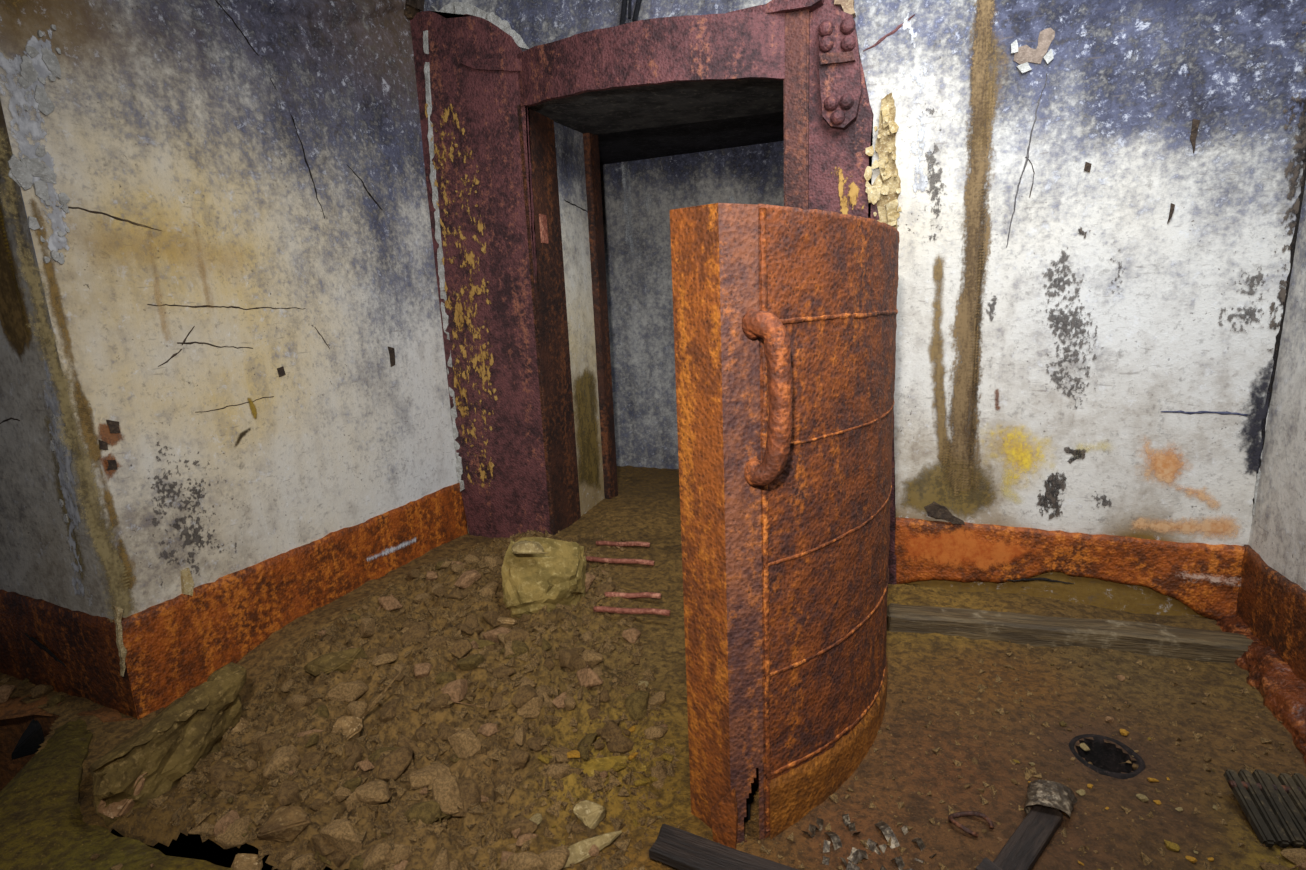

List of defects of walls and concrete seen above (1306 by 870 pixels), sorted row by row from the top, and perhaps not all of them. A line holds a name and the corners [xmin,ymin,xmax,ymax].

peeling [903,15,917,48]
peeling [0,24,70,264]
peeling [831,66,931,228]
water stain [924,143,946,240]
water stain [0,129,136,618]
water stain [986,295,997,321]
water stain [1040,247,1103,409]
water stain [146,433,244,575]